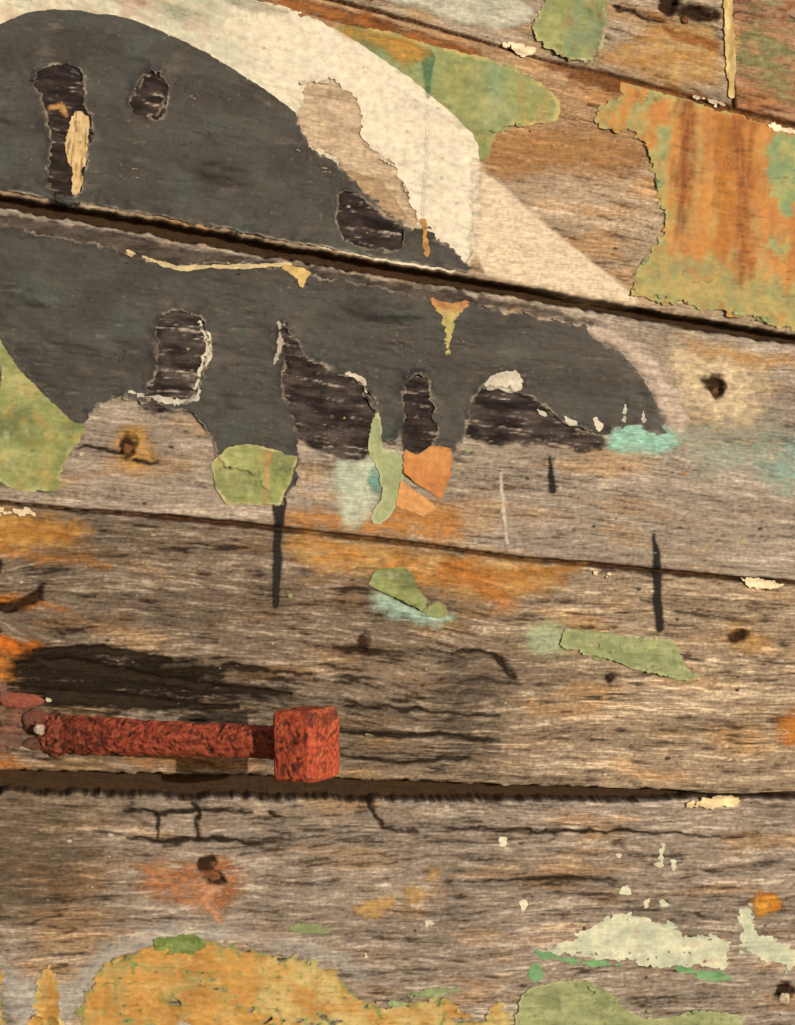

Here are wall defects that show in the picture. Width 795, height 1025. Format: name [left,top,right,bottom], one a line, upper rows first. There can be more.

peeling [391,0,608,62]
peeling [0,0,560,273]
peeling [594,82,795,332]
peeling [0,223,672,524]
peeling [368,567,448,618]
peeling [560,628,699,682]
peeling [654,843,677,874]
peeling [75,898,795,1025]
peeling [27,964,64,1025]